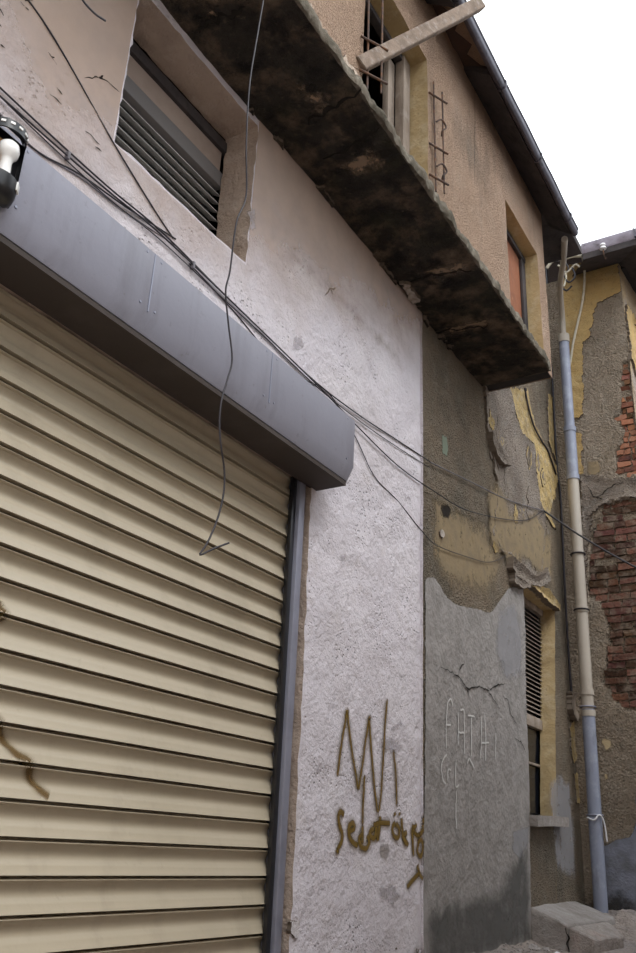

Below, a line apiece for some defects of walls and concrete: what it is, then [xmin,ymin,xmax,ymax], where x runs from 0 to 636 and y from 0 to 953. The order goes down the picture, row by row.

spalling [316,185,334,208]
damp [342,151,384,175]
spalling [373,252,429,328]
peeling [563,263,621,419]
flaking render [483,386,558,589]
spalling [576,304,636,708]
crack [441,664,526,752]